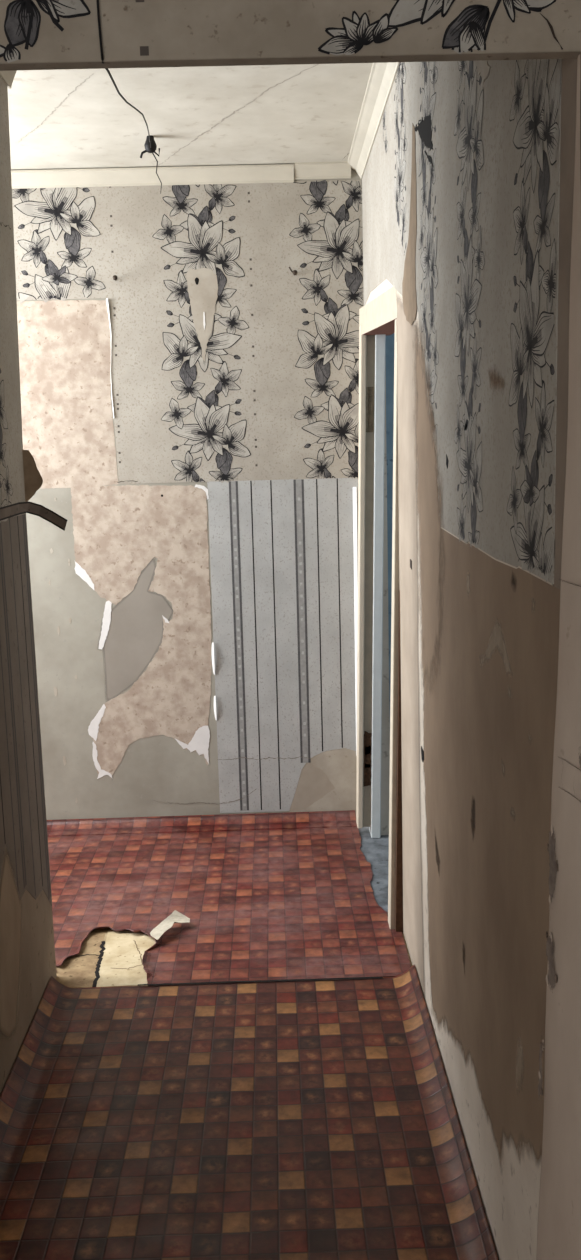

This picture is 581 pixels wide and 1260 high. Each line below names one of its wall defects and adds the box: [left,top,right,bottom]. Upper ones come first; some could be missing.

peeling [186,268,218,361]
peeling [17,299,217,779]
peeling [547,824,558,903]
peeling [546,931,558,988]